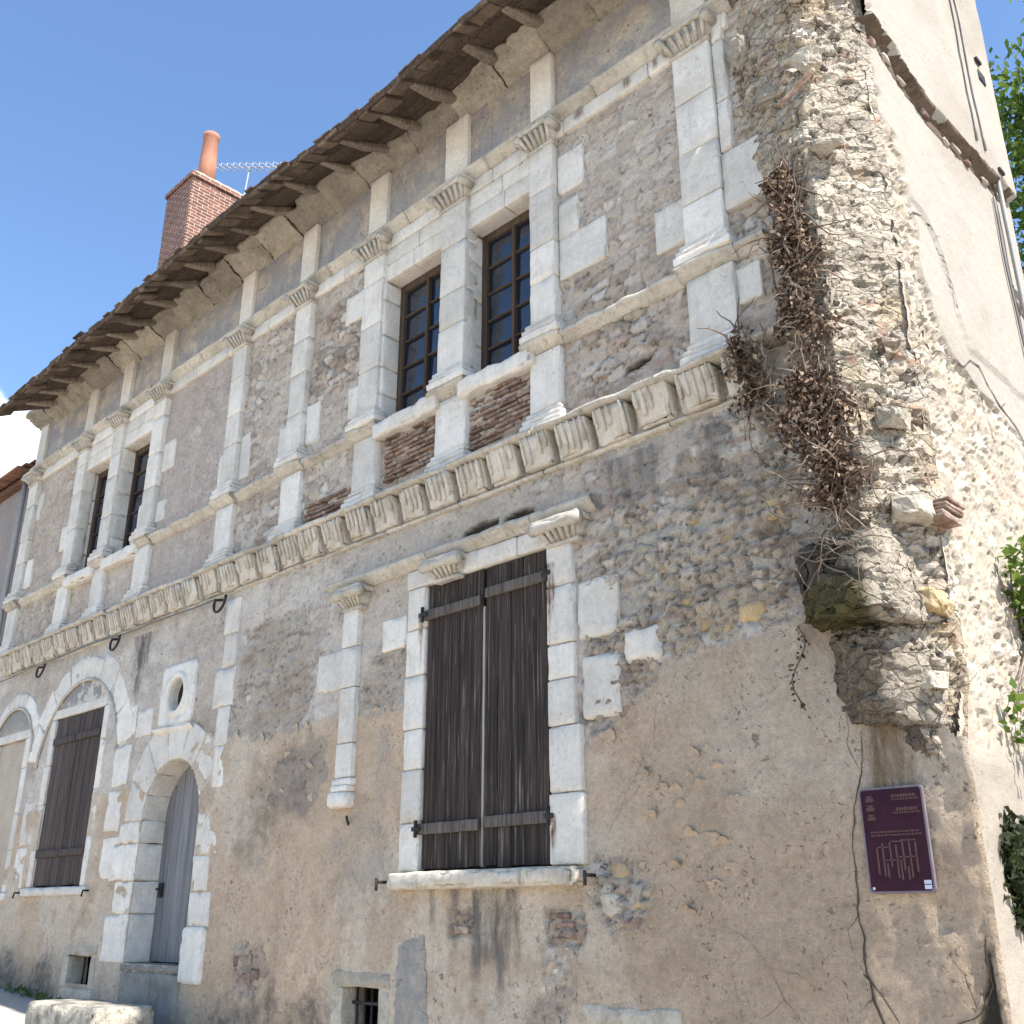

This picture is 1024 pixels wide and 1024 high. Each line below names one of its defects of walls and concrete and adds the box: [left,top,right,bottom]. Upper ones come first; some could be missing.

crack [913,212,961,316]
spalling [575,0,1014,775]
leakage [472,889,517,988]
spalling [540,850,658,955]
crack [846,713,900,1024]